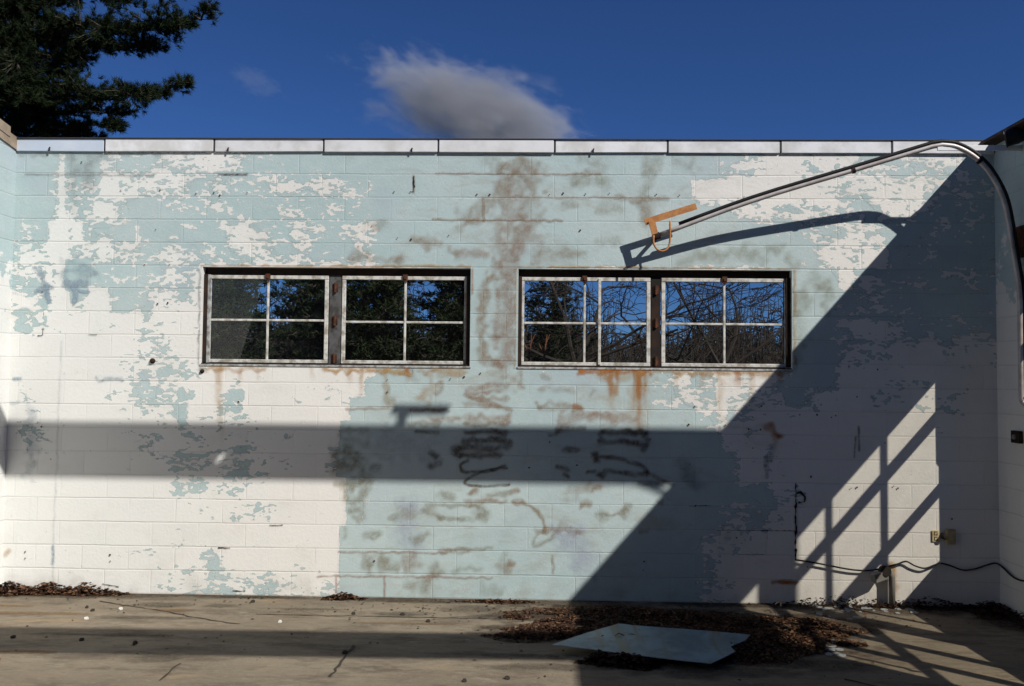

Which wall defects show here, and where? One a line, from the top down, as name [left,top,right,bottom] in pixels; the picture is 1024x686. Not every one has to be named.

peeling [11,152,424,522]
peeling [132,368,381,596]
corrosion [324,367,411,376]
corrosion [579,370,706,396]
peeling [651,154,997,603]